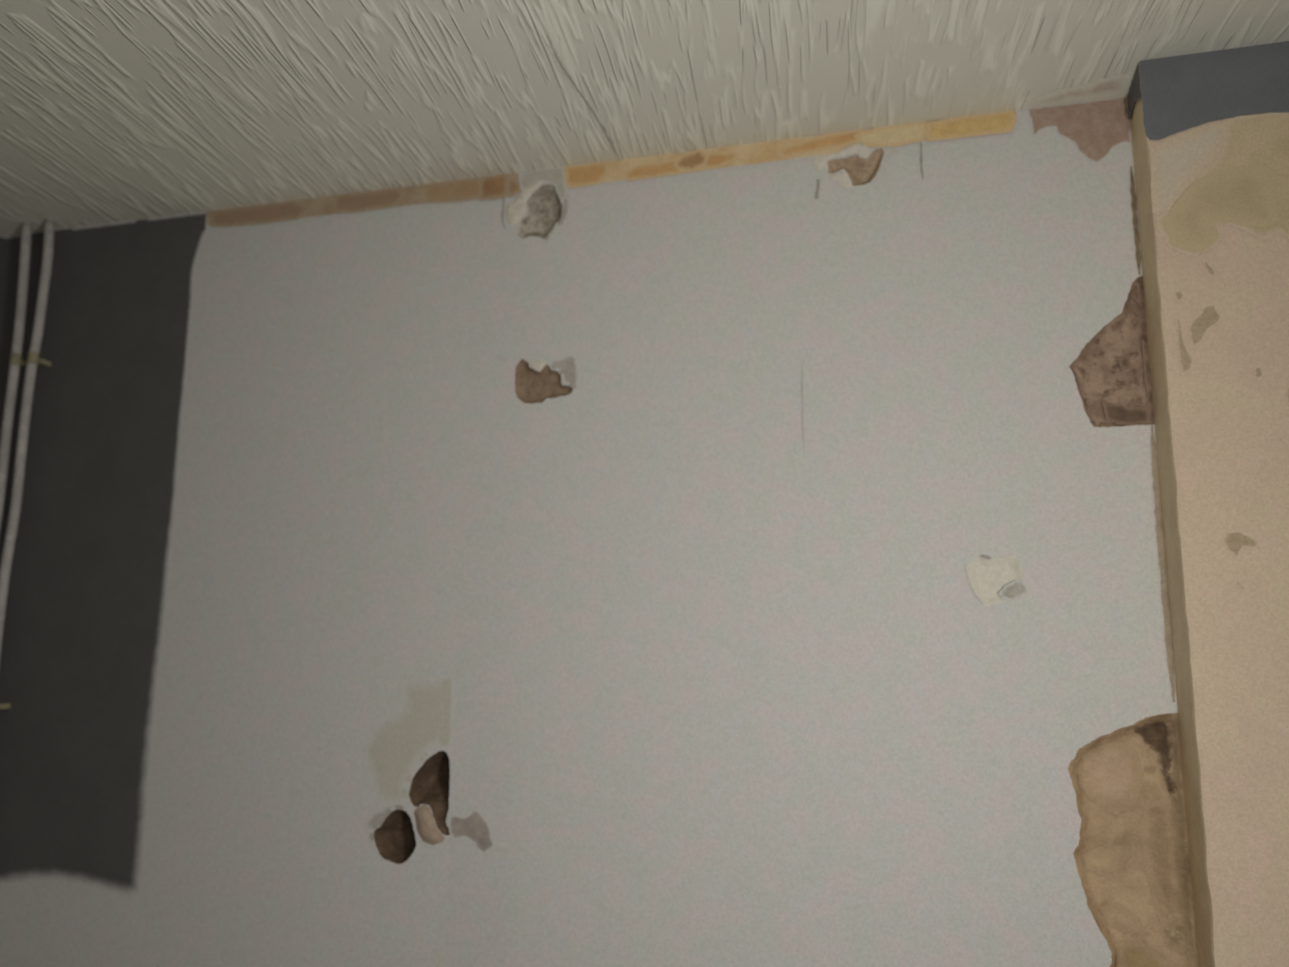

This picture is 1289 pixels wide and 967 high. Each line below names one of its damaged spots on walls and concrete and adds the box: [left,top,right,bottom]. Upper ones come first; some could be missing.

peeling [1027,97,1132,163]
spalling [501,167,570,245]
spalling [811,143,904,199]
leakage [1155,113,1289,277]
spalling [495,354,579,404]
spalling [1069,276,1155,427]
leakage [1189,305,1221,348]
spalling [964,554,1031,607]
spalling [364,751,521,864]
spalling [1067,713,1198,967]